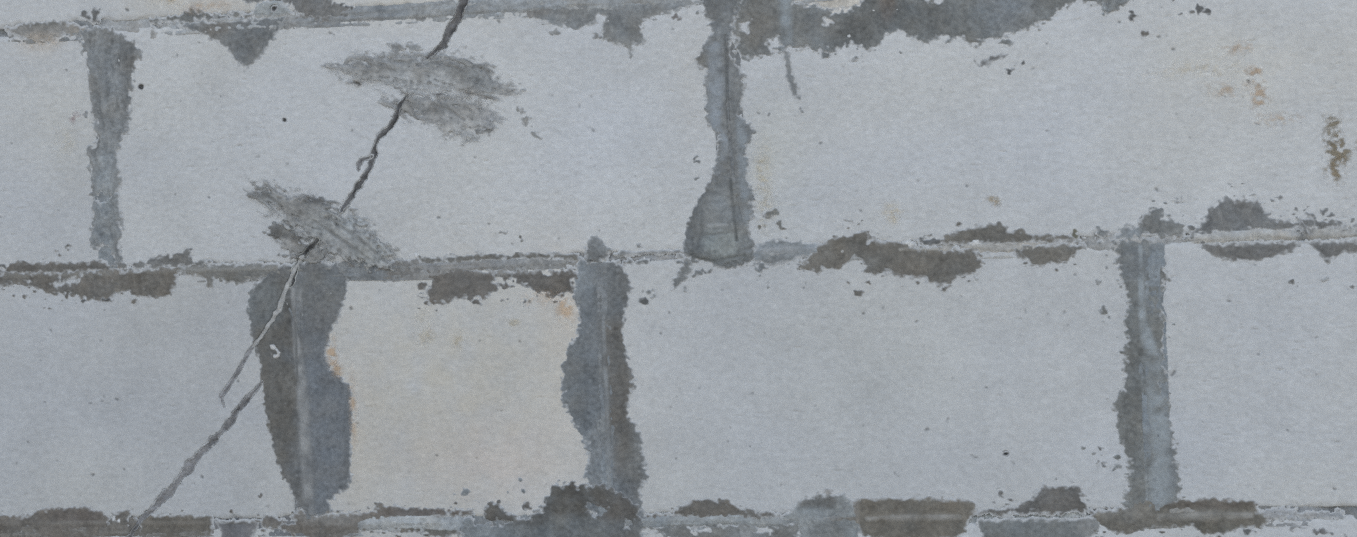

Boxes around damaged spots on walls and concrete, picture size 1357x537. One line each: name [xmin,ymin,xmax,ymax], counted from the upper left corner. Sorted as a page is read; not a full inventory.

crack [425,0,470,60]
crack [339,94,408,214]
crack [127,237,320,537]